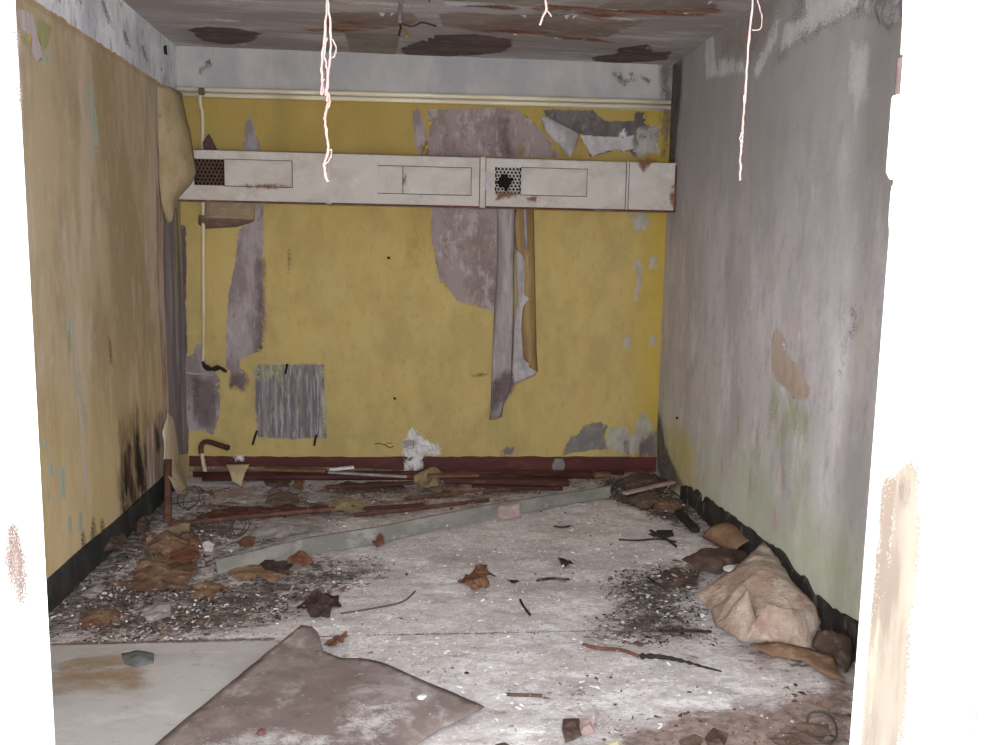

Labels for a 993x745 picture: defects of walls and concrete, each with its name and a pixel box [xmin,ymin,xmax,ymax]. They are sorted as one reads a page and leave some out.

corrosion [467,4,725,23]
damp [691,0,782,79]
peeling [412,107,661,159]
peeling [155,85,330,455]
peeling [430,208,516,420]
peeling [766,321,814,451]
damp [113,393,169,514]
spalling [401,427,442,471]
spalling [552,422,608,470]